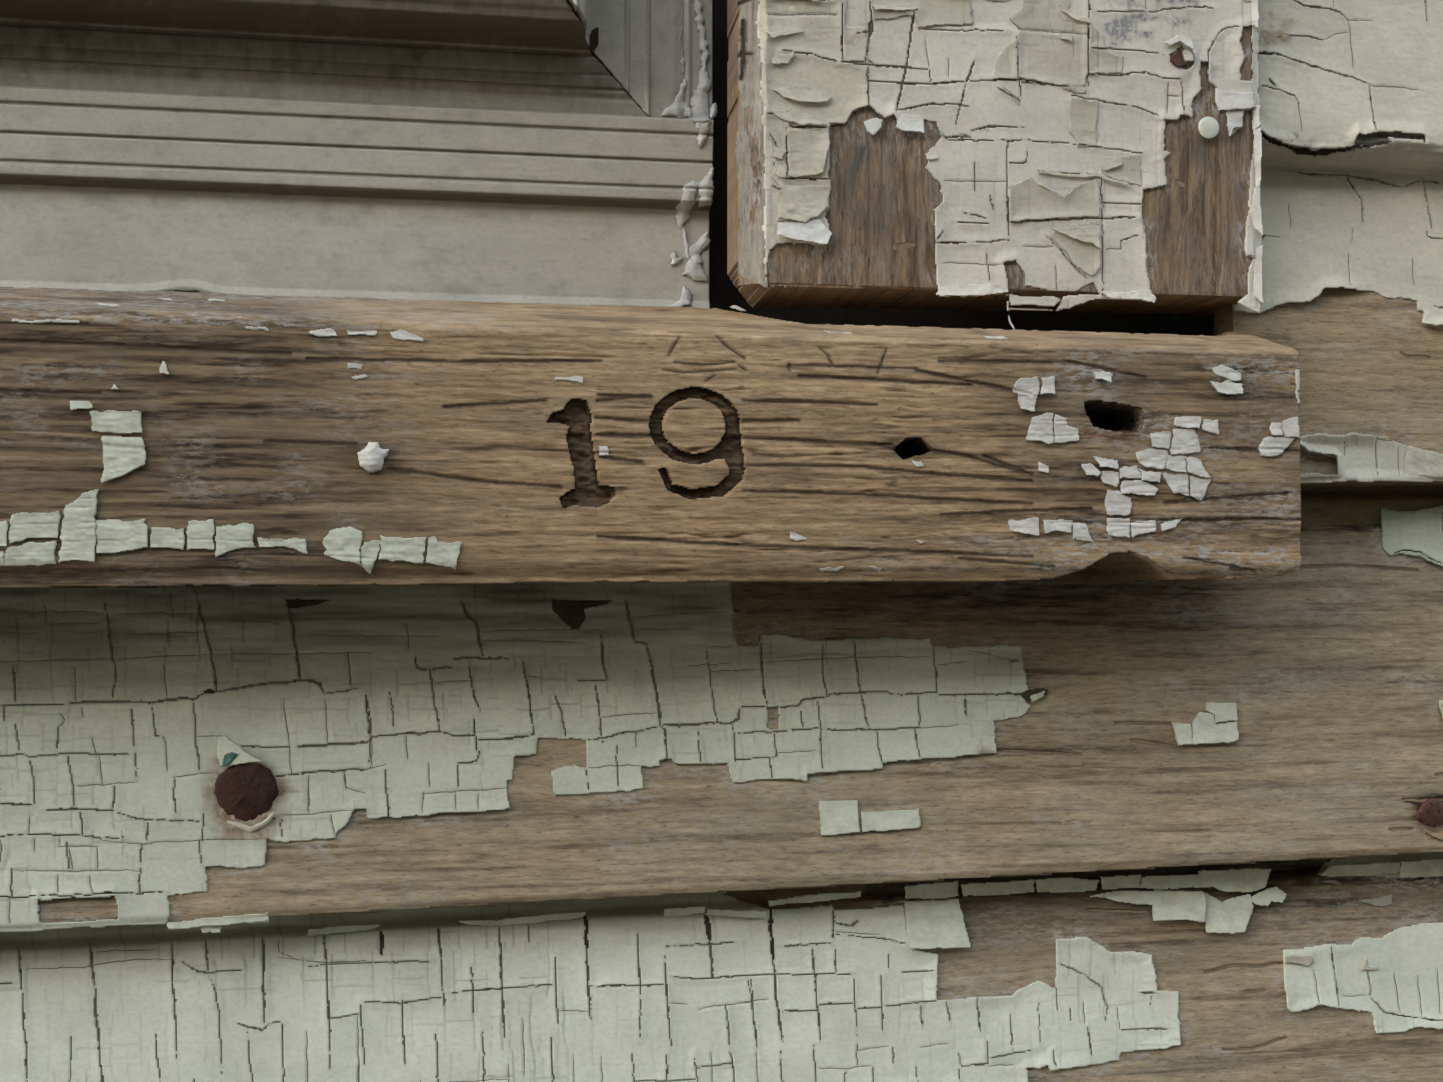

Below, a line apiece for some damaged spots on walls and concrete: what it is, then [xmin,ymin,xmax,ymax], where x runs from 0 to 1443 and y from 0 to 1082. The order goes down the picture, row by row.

peeling [738,0,1061,307]
crack [769,0,1443,309]
peeling [993,0,1443,483]
peeling [347,363,368,380]
peeling [309,328,425,342]
spalling [667,336,746,381]
peeling [0,401,462,574]
peeling [1008,416,1219,542]
peeling [38,891,118,930]
crack [0,601,1167,1082]
peeling [167,524,1443,1082]